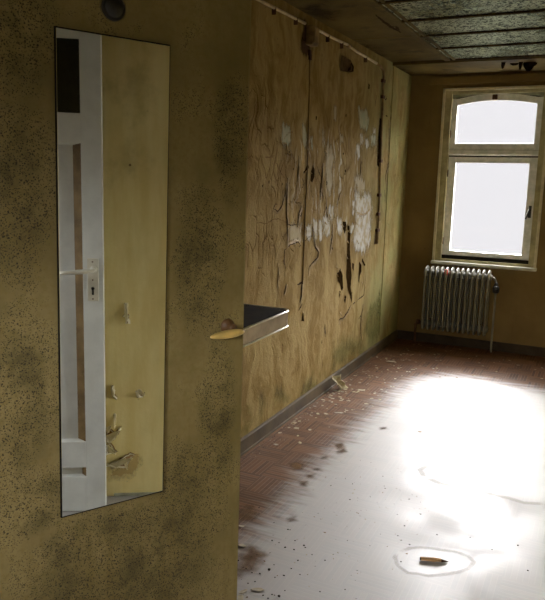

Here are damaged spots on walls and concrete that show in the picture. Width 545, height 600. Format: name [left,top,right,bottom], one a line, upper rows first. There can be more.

peeling [322,137,335,196]
peeling [355,107,381,167]
crack [259,121,341,311]
peeling [289,174,378,302]
crack [321,278,366,343]